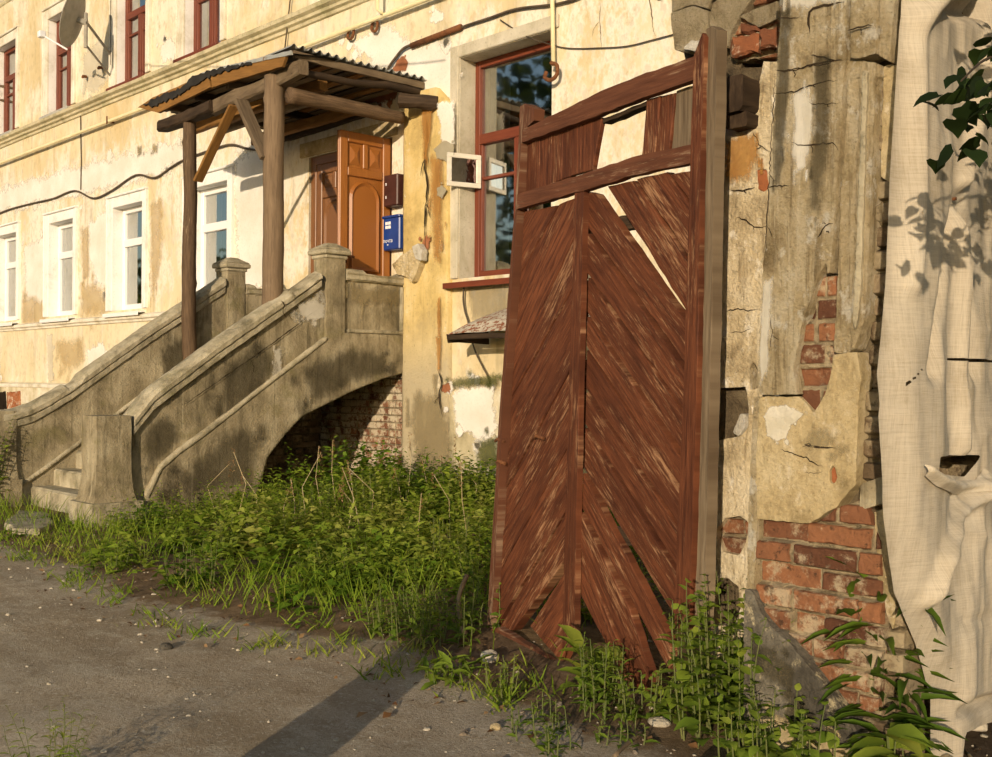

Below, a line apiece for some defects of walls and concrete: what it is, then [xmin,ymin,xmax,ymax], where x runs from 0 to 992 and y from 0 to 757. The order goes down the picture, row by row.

corrosion [725,133,763,180]
crack [731,2,842,264]
water stain [134,420,174,483]
water stain [164,341,183,374]
water stain [170,428,264,510]
water stain [209,343,282,416]
water stain [302,350,395,412]
peeling [441,373,498,455]
flaking render [763,276,842,445]
flaking render [756,499,891,713]